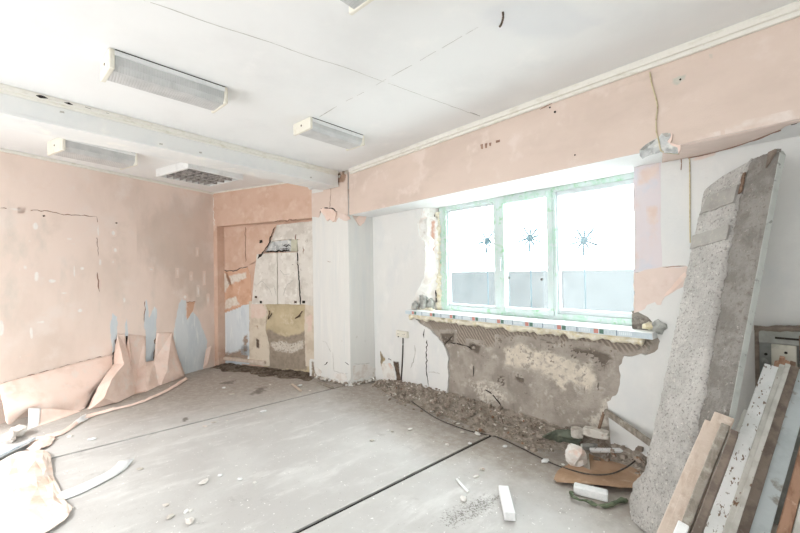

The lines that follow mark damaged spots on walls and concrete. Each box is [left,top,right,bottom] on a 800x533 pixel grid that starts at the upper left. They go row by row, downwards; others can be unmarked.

spalling [639,133,681,159]
crack [31,210,100,292]
peeling [224,270,249,313]
spalling [266,304,305,332]
spalling [411,208,667,400]
spalling [508,375,610,470]